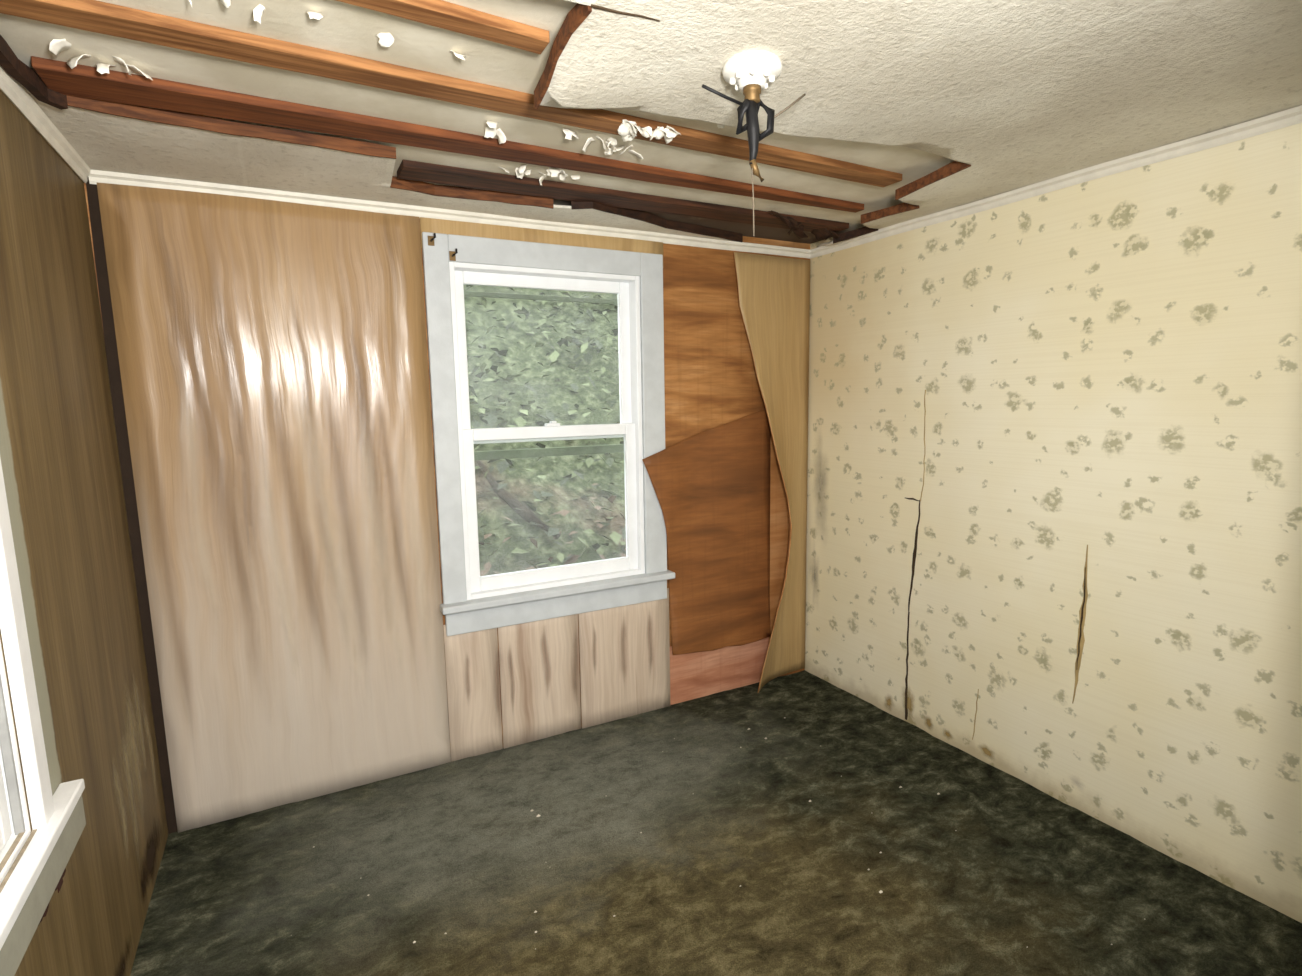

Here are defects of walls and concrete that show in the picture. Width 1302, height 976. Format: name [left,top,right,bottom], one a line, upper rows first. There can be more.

peeling [253,5,266,24]
peeling [49,39,153,80]
peeling [376,33,394,47]
peeling [484,121,506,144]
peeling [562,119,681,160]
peeling [499,165,580,185]
peeling [734,252,810,693]
crack [905,390,926,720]
crack [1072,545,1088,704]